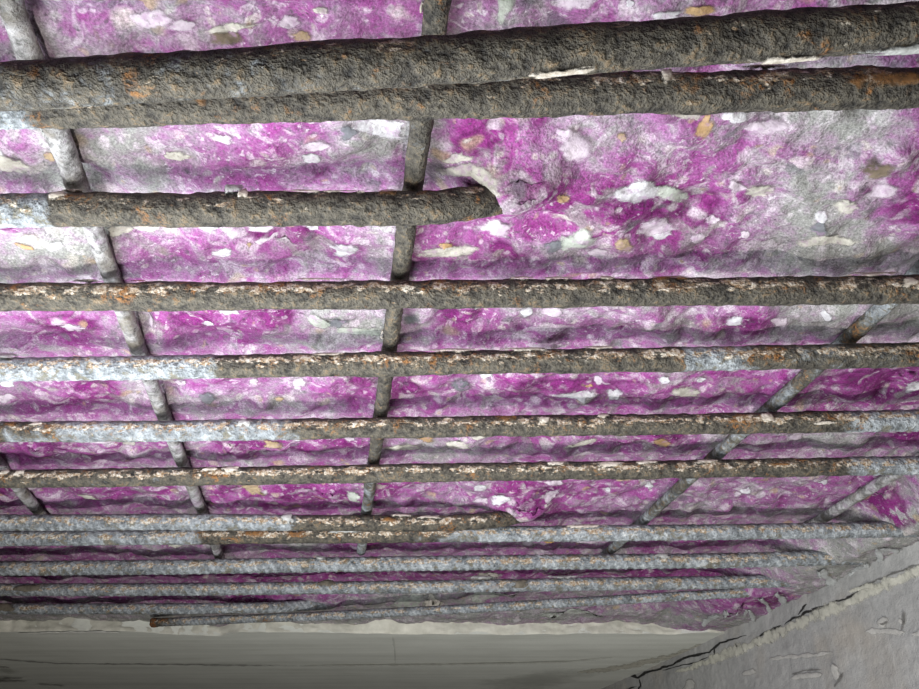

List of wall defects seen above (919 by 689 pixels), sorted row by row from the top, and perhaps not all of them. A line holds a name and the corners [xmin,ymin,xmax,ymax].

spalling [0,0,919,194]
spalling [0,108,919,636]
crack [629,565,919,689]